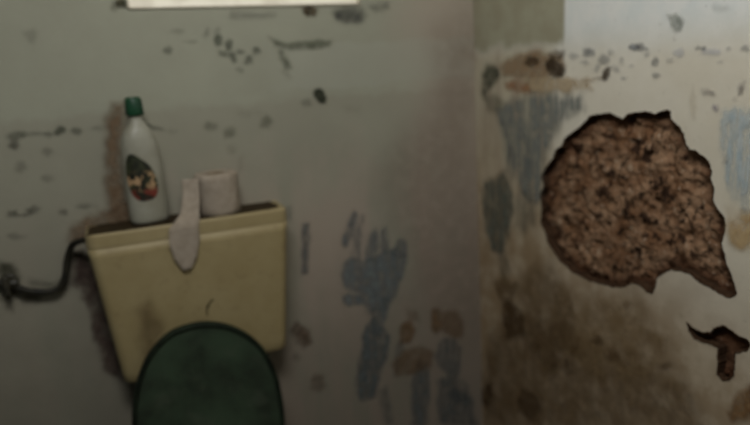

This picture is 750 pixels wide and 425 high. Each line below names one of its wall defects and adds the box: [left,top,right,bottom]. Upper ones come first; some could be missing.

spalling [314,88,327,103]
peeling [501,51,577,93]
peeling [482,174,513,252]
spalling [540,110,737,298]
spalling [686,322,750,381]